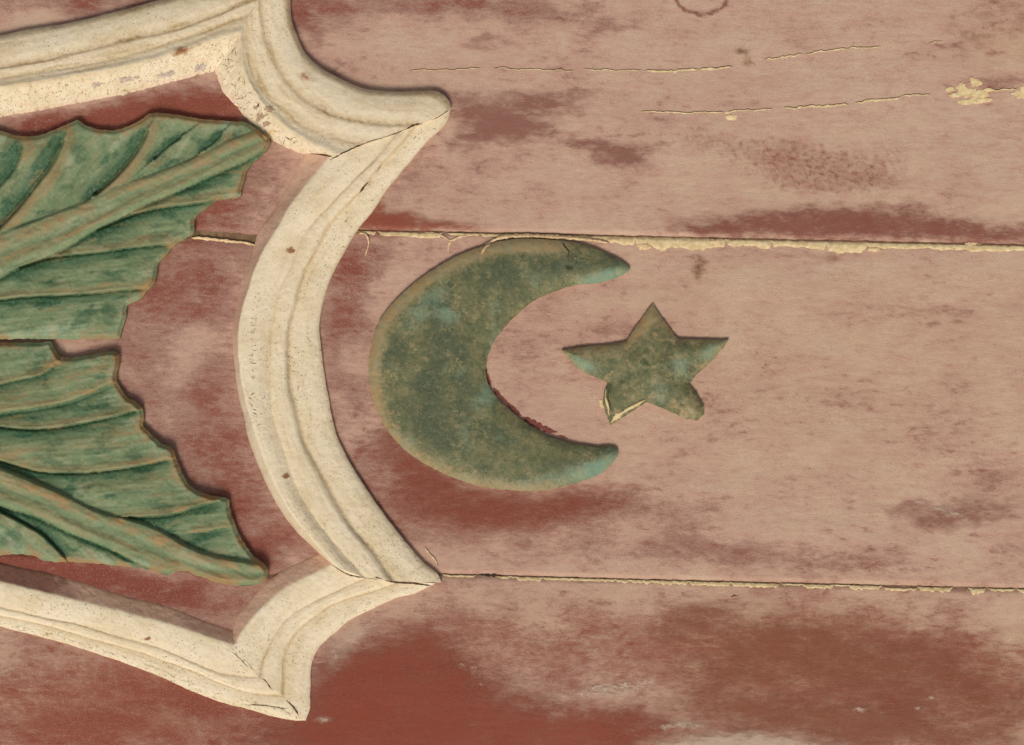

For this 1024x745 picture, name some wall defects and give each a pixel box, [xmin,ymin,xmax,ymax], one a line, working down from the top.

crack [765,42,881,60]
crack [412,65,731,73]
peeling [946,77,994,105]
crack [642,93,931,120]
peeling [358,231,522,239]
peeling [560,235,1024,254]
peeling [498,576,953,597]